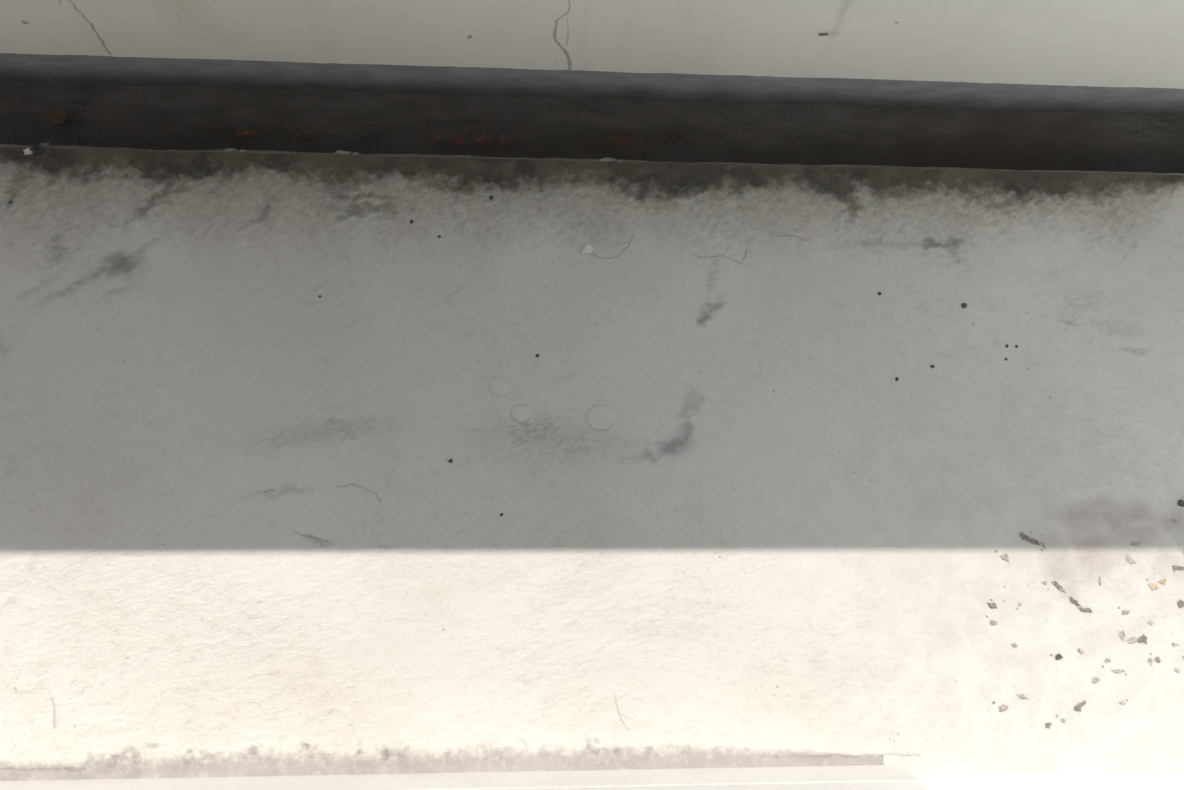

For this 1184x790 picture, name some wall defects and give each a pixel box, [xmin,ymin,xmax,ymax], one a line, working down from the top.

water stain [0,147,1184,202]
peeling [1020,532,1046,551]
peeling [1146,549,1184,590]
peeling [1042,581,1092,612]
peeling [1119,620,1161,665]